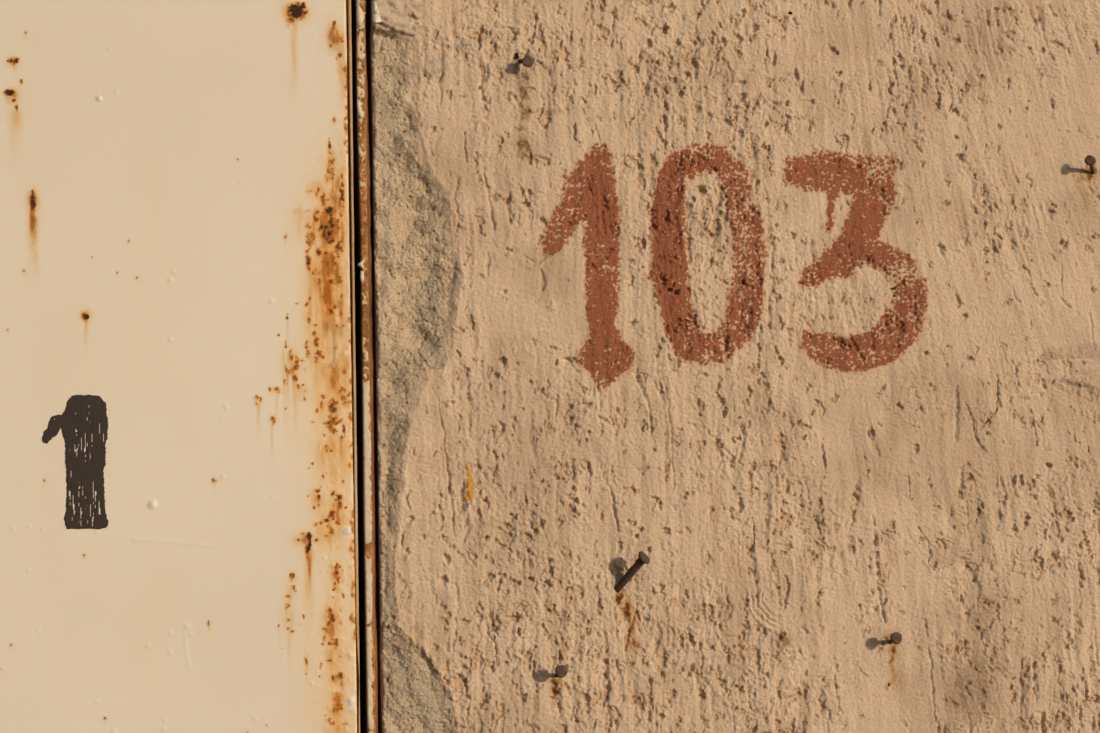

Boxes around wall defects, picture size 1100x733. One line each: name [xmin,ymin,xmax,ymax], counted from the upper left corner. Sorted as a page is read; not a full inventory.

rust [287,2,308,22]
rust [306,141,351,327]
rust [256,297,324,404]
spalling [356,0,457,733]
rust [313,371,353,465]
rust [297,475,355,569]
rust [322,563,355,647]
rust [305,658,348,725]